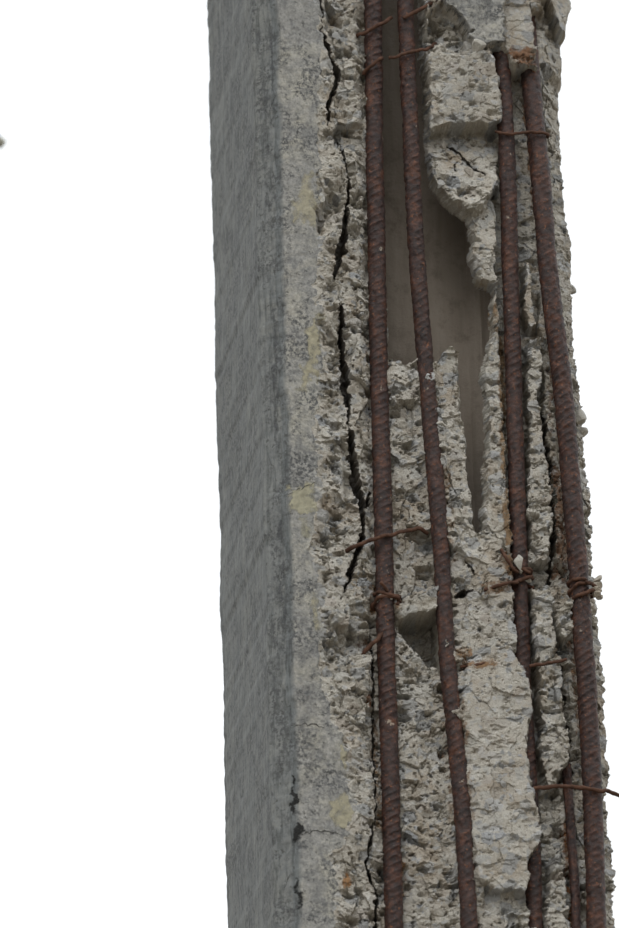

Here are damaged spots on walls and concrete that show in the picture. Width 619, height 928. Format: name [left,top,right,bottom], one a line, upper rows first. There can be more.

crack [319,0,352,280]
rust [507,46,536,68]
spalling [308,0,385,928]
crack [337,303,371,593]
spalling [382,0,587,928]
rust [481,303,513,594]
crack [364,635,379,928]
spalling [576,423,616,928]